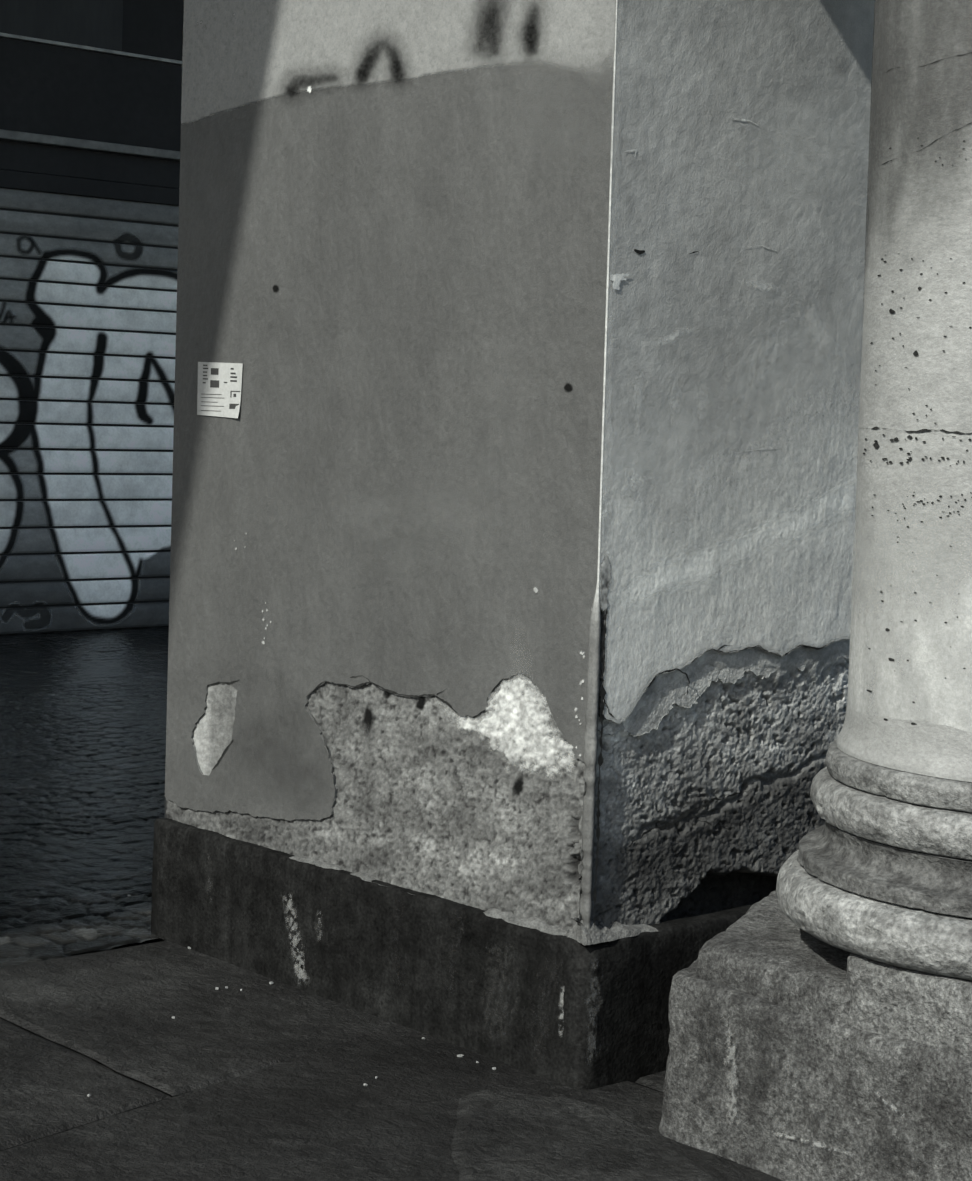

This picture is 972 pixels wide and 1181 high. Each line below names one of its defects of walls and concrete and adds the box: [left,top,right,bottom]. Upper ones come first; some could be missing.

crack [869,426,972,434]
spalling [166,639,851,1023]